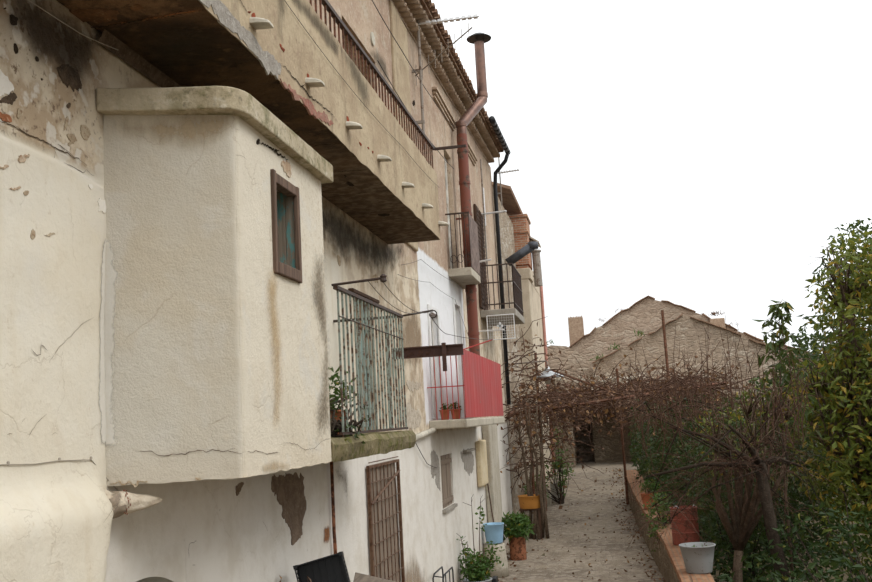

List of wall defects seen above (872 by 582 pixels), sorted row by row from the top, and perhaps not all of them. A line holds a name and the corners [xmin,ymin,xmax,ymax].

leakage [17,4,91,83]
flaking render [56,66,82,92]
flaking render [198,0,334,126]
flaking render [0,92,24,122]
crack [0,121,92,175]
flaking render [64,103,91,146]
crack [139,439,328,456]
flaking render [271,472,307,545]